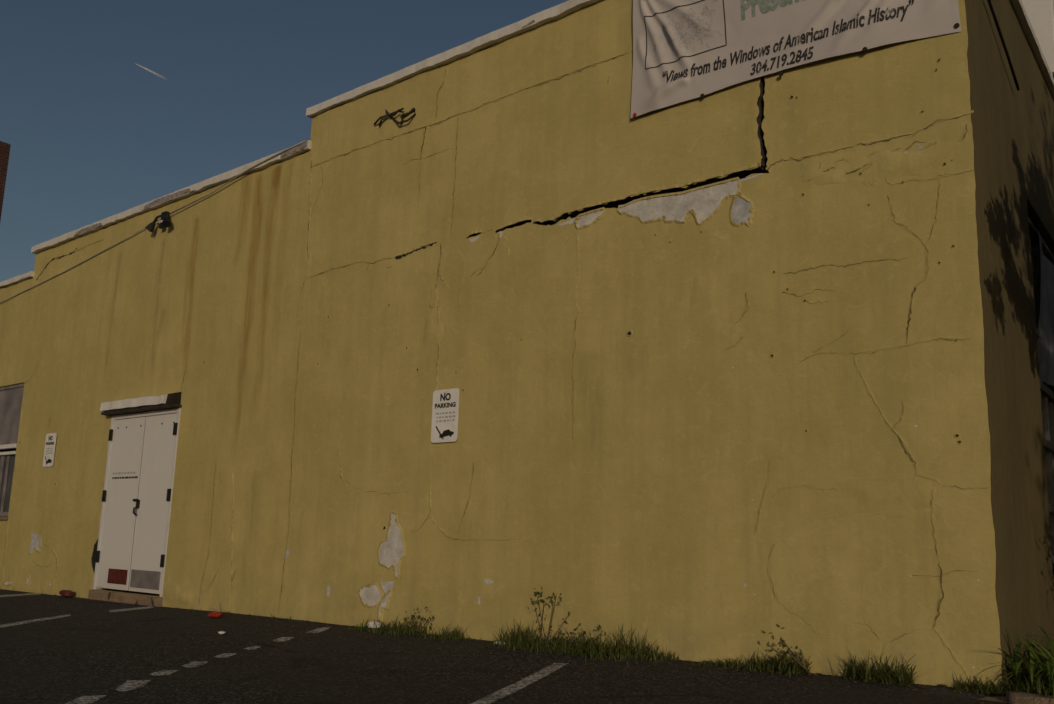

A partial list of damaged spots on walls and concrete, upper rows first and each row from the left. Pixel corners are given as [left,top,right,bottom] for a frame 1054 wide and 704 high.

peeling [558,173,762,236]
crack [278,50,992,686]
peeling [358,511,406,622]